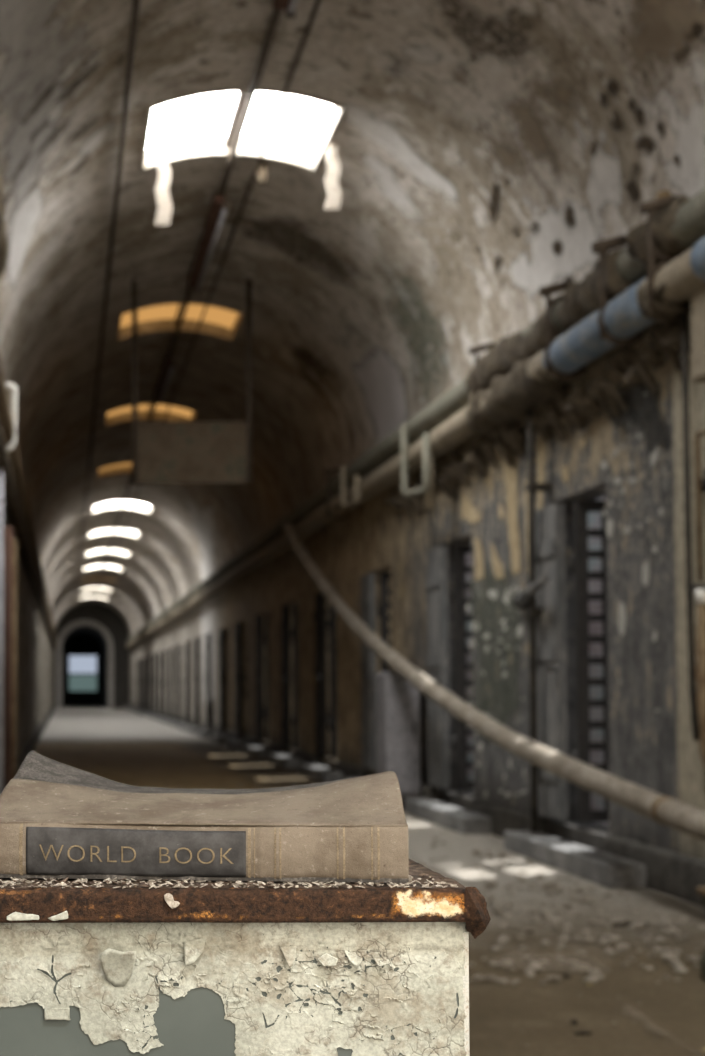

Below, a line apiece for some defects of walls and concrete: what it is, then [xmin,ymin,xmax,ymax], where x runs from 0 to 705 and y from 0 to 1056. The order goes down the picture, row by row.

peeling [343,104,457,231]
peeling [477,22,705,301]
flaking render [461,492,481,524]
flaking render [466,427,553,678]
peeling [618,601,627,637]
peeling [601,423,665,539]
peeling [641,545,659,587]